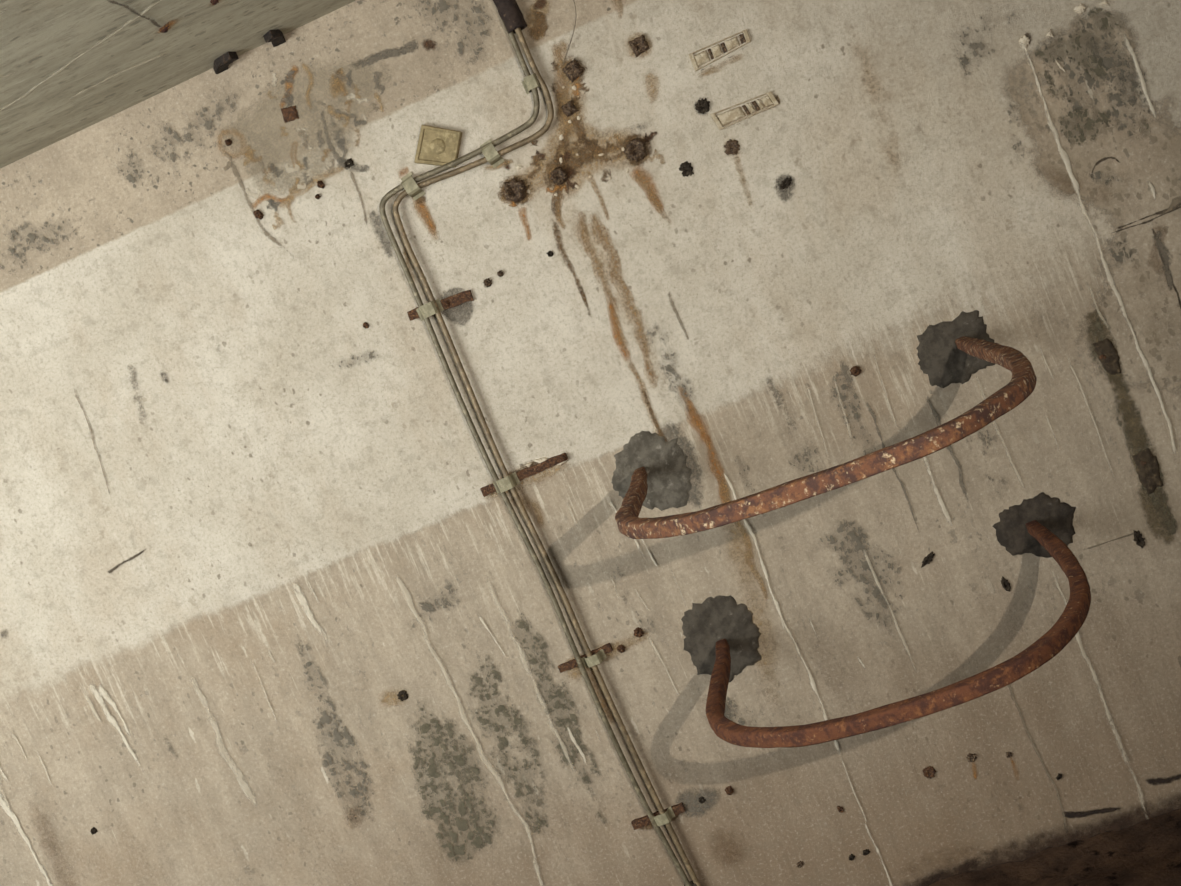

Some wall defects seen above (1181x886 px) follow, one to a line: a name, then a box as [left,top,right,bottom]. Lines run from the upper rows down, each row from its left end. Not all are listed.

crack [108,0,162,27]
leakage [960,17,989,75]
leakage [118,154,144,183]
leakage [152,46,415,245]
rust [487,45,667,442]
crack [1115,198,1181,308]
rust [680,388,731,503]
leakage [300,645,373,821]
leakage [410,708,495,861]
leakage [469,617,547,834]
leakage [514,613,599,790]